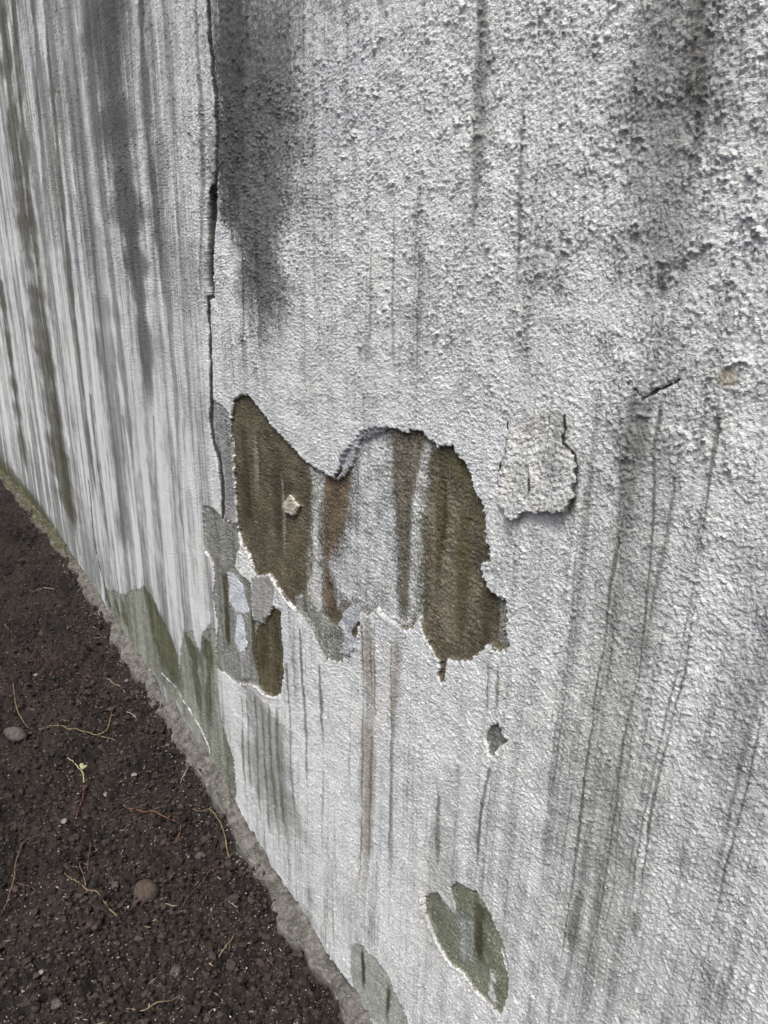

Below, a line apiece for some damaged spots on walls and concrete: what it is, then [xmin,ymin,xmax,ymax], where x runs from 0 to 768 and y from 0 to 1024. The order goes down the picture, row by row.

damp [0,0,75,525]
damp [43,0,84,394]
damp [85,407,95,484]
damp [89,0,163,392]
crack [207,0,225,518]
damp [208,0,307,340]
flaking render [105,395,510,798]
crack [627,378,681,401]
peeling [416,882,509,1021]